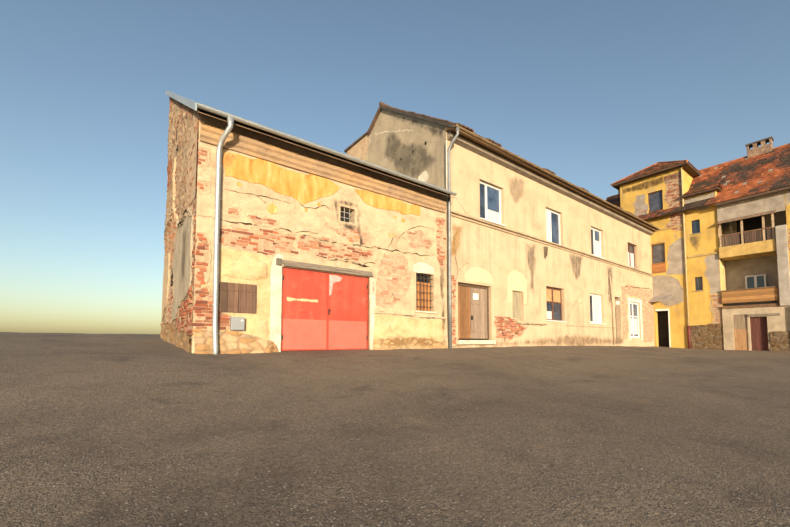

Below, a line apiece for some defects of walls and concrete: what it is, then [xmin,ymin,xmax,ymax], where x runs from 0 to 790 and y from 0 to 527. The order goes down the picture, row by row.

leakage [386,135,430,177]
crack [164,158,435,268]
spalling [161,124,457,346]
spalling [493,315,529,342]
spalling [621,171,716,344]
flaking render [703,253,723,328]